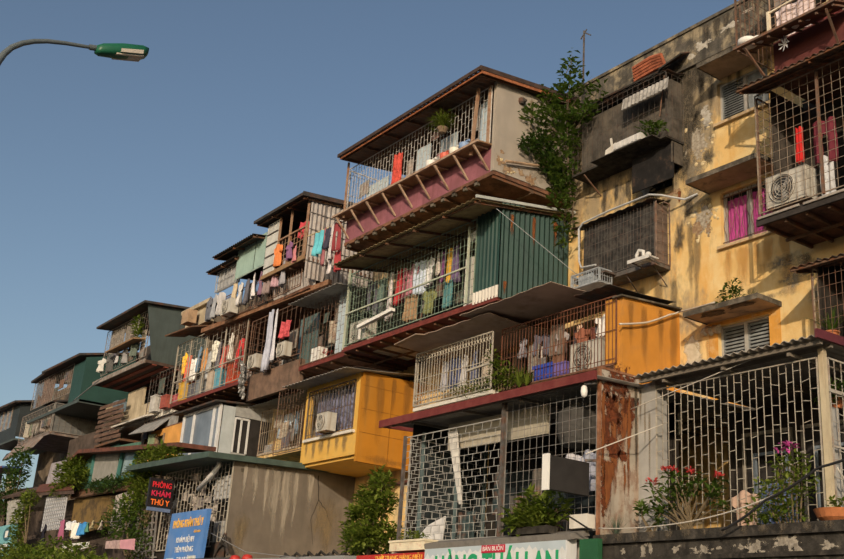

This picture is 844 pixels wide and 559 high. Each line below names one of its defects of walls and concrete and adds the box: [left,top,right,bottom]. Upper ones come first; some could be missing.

peeling [687,38,712,60]
leakage [674,67,714,178]
leakage [602,180,631,211]
leakage [675,188,711,278]
peeling [687,203,719,243]
rust [597,364,639,528]
peeling [691,545,722,554]
peeling [733,535,803,553]